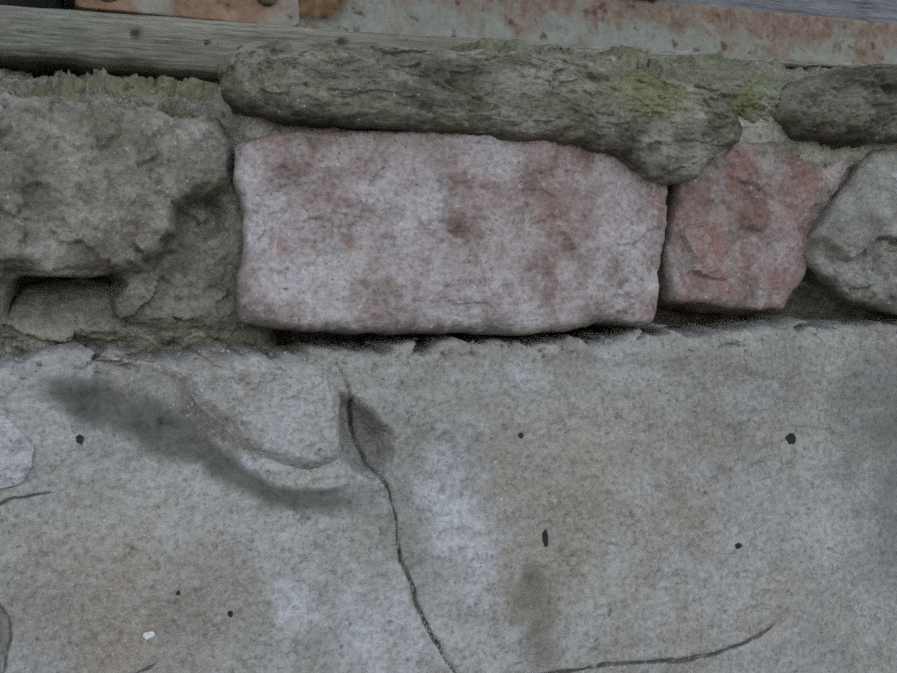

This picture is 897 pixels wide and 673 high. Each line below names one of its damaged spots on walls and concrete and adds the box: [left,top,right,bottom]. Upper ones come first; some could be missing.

crack [342,374,456,673]
spalling [0,604,12,673]
crack [549,620,778,673]